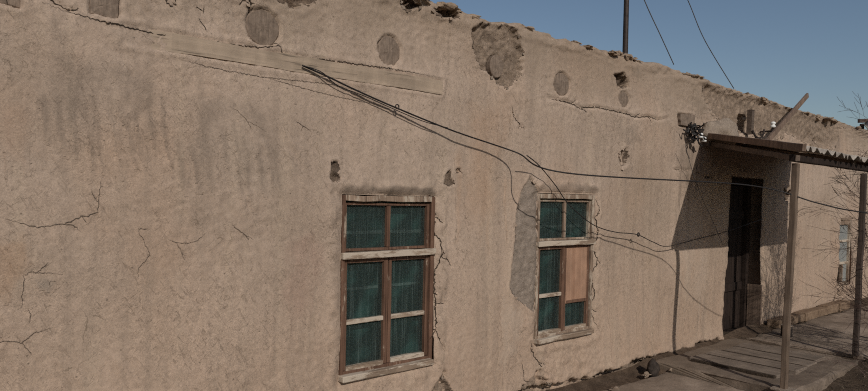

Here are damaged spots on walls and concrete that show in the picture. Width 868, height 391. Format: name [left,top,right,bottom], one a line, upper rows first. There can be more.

crack [44,0,166,36]
crack [197,7,283,53]
spalling [400,0,438,13]
crack [316,58,439,78]
spalling [471,22,525,90]
crack [551,98,664,119]
peeling [330,160,341,183]
crack [5,182,101,228]
peeling [510,177,538,311]
crack [430,213,450,351]
crack [2,264,51,353]
spalling [433,377,453,391]